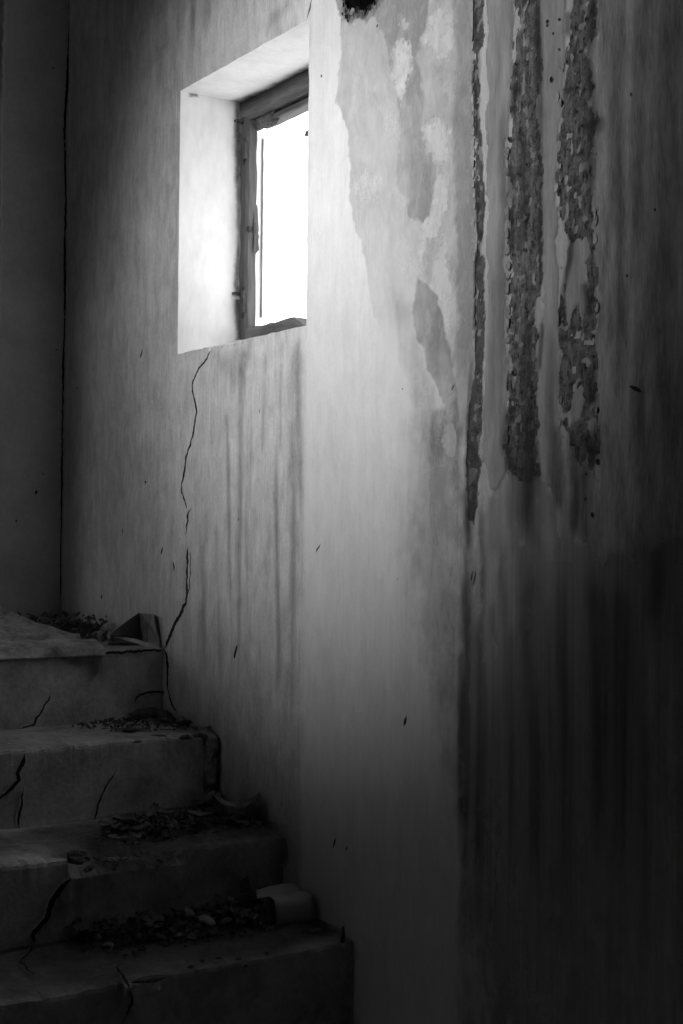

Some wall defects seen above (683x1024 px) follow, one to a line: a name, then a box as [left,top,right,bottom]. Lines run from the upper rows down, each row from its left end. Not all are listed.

spalling [336,0,381,22]
peeling [465,0,683,569]
crack [101,351,211,715]
crack [0,692,52,830]
crack [92,769,117,820]
crack [16,877,72,972]